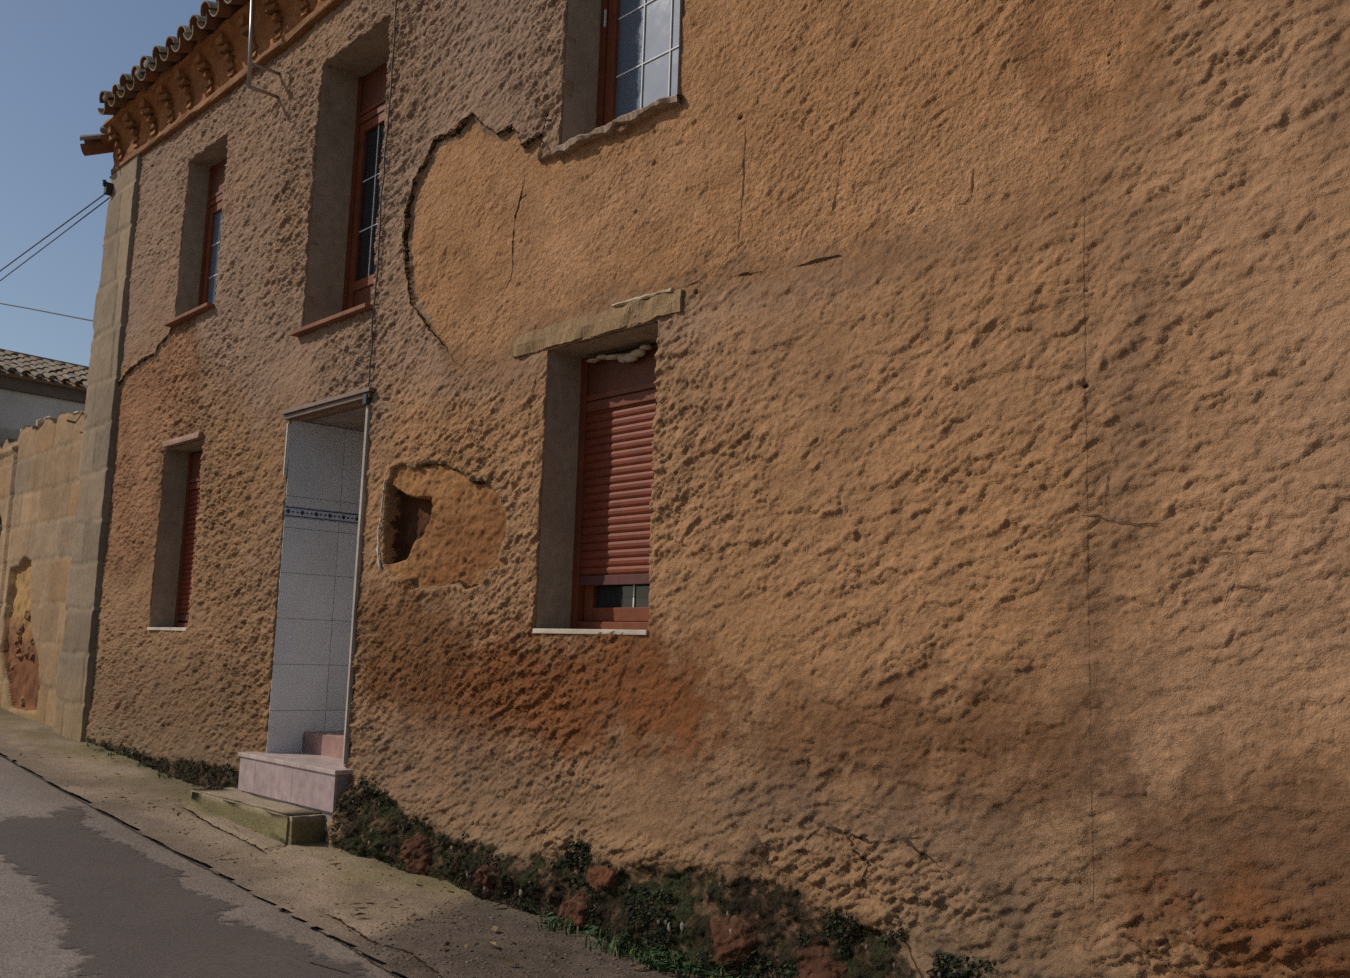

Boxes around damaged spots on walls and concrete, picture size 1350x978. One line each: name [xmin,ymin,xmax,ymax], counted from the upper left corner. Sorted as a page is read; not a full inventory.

flaking render [402,0,1175,383]
flaking render [376,458,508,591]
spalling [3,559,40,710]
water stain [357,577,727,761]
water stain [762,673,1118,813]
water stain [1119,768,1350,978]